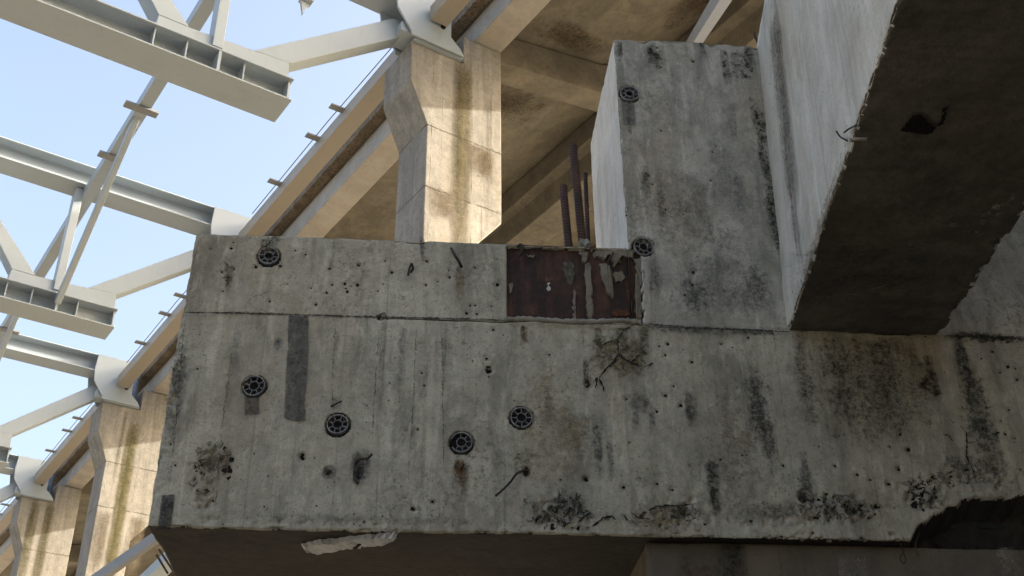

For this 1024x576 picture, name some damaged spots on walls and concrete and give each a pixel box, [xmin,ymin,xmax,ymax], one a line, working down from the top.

damp [723,48,753,79]
spalling [901,107,949,135]
crack [594,323,790,391]
damp [904,334,998,510]
peeling [194,442,234,480]
peeling [901,477,938,516]
peeling [532,504,595,531]